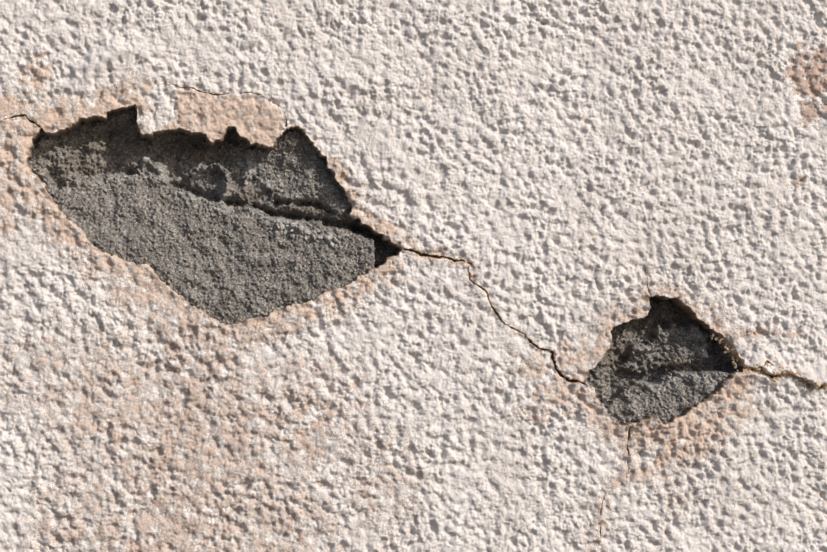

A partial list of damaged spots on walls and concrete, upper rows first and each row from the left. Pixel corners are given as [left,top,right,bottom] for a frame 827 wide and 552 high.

spalling [26,90,404,326]
crack [403,245,587,386]
spalling [585,294,748,427]
crack [742,359,827,392]